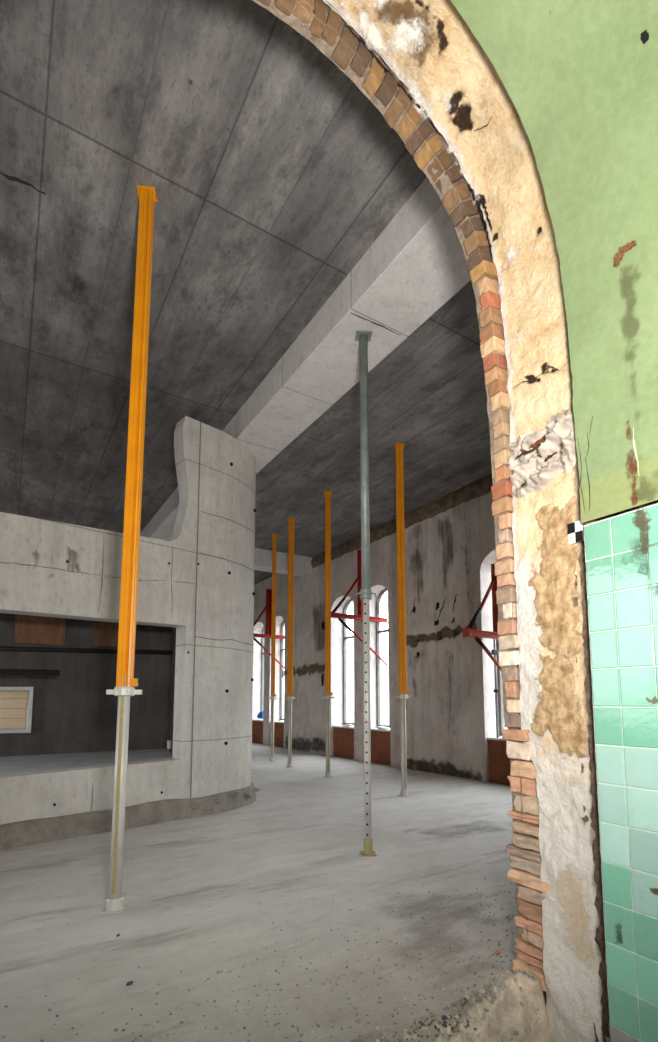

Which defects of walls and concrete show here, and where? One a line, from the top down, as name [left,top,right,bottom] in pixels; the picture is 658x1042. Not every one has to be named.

peeling [359,0,451,118]
rust [613,241,637,268]
rust [627,422,650,553]
peeling [507,408,611,1042]